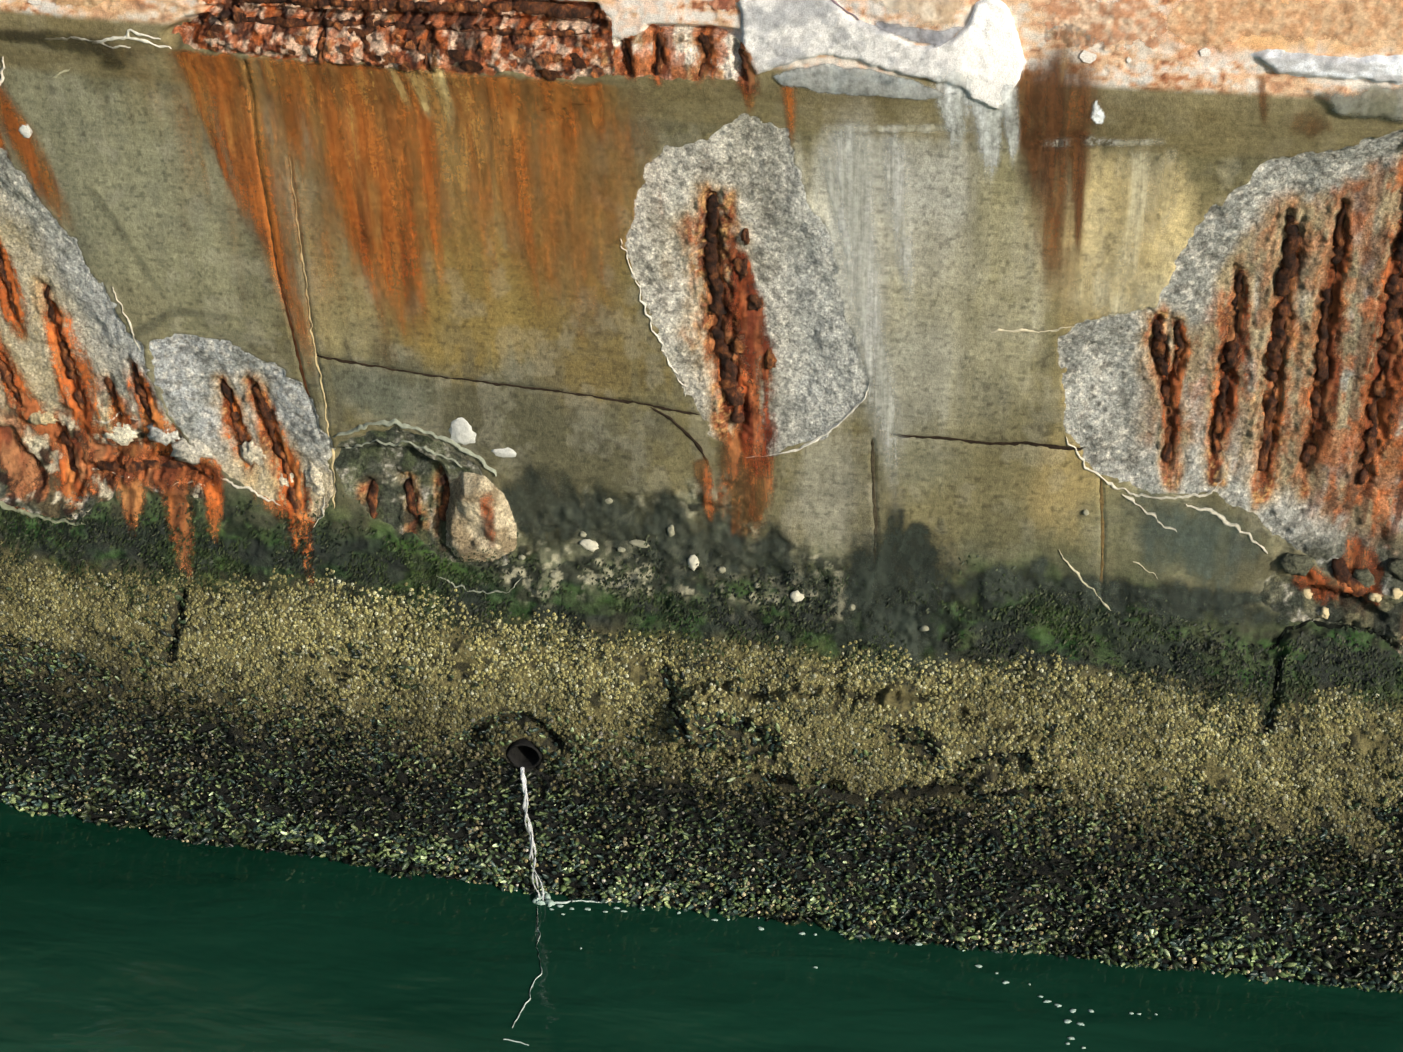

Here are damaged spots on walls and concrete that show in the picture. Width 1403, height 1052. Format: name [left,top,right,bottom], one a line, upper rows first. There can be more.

rust [114,438,223,578]
spalling [0,148,519,566]
rust [177,51,603,328]
crack [245,61,709,508]
crack [659,666,771,741]
spalling [620,113,870,476]
water stain [501,466,1290,682]
water stain [825,73,1018,435]
crack [965,750,1015,762]
rust [1015,50,1092,269]
water stain [1051,137,1175,260]
spalling [1057,130,1403,655]